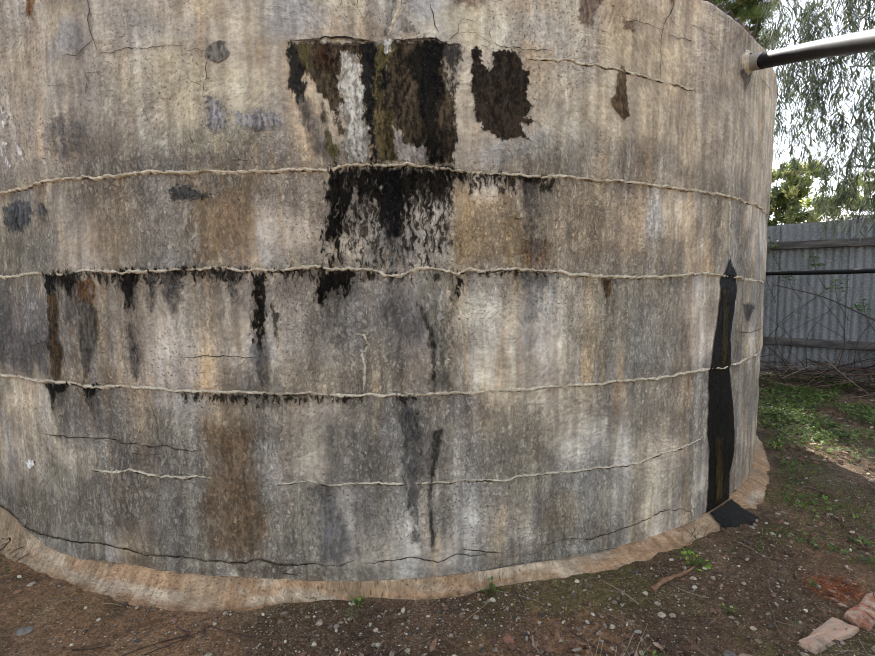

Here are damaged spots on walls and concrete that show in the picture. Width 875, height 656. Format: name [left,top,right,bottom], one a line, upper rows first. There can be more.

crack [47,0,207,96]
leakage [579,0,603,25]
leakage [611,65,630,120]
leakage [41,0,560,409]
leakage [707,259,758,529]
leakage [396,393,443,548]
crack [0,505,497,576]